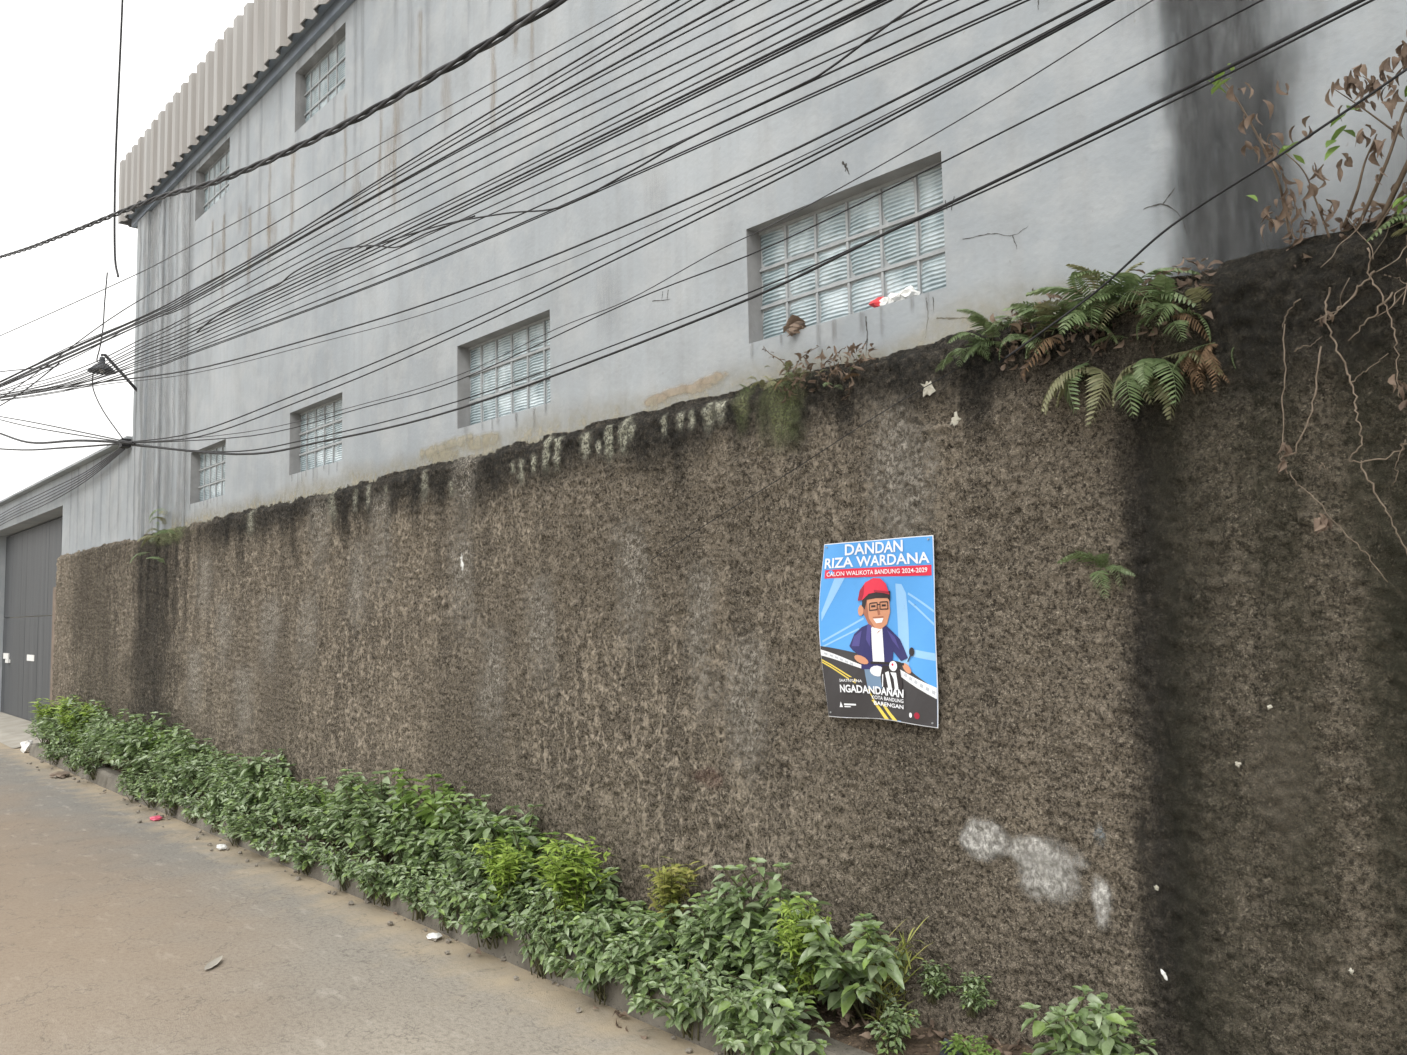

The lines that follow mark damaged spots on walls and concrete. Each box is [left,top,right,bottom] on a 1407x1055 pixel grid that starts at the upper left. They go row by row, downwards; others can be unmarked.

damp [1167,0,1285,275]
damp [129,294,1121,730]
damp [724,642,765,759]
damp [1127,385,1197,1030]
damp [1350,343,1407,928]